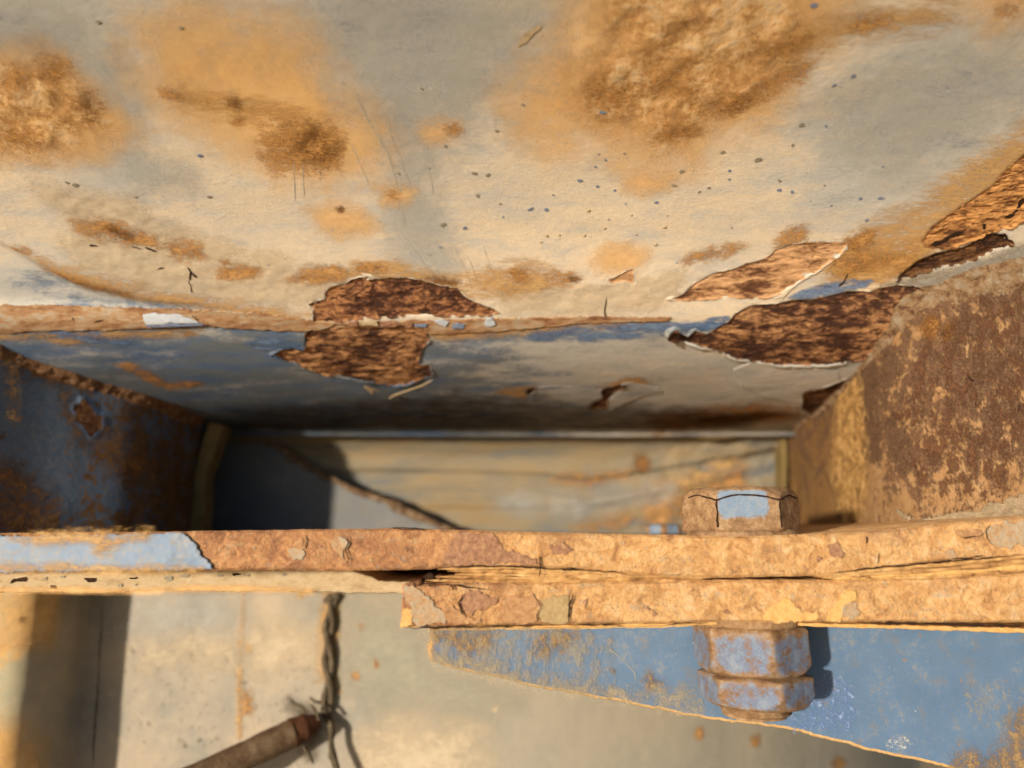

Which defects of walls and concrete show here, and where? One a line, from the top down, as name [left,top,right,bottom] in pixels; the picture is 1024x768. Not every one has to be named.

rust [0,55,124,161]
rust [145,10,378,175]
rust [518,0,947,161]
rust [0,460,202,575]
rust [317,592,342,692]
rust [331,536,351,562]
peeling [267,273,501,399]
rust [400,532,706,682]
peeling [664,233,1015,415]
rust [831,377,868,523]
rust [763,520,1024,624]
rust [892,282,1024,514]